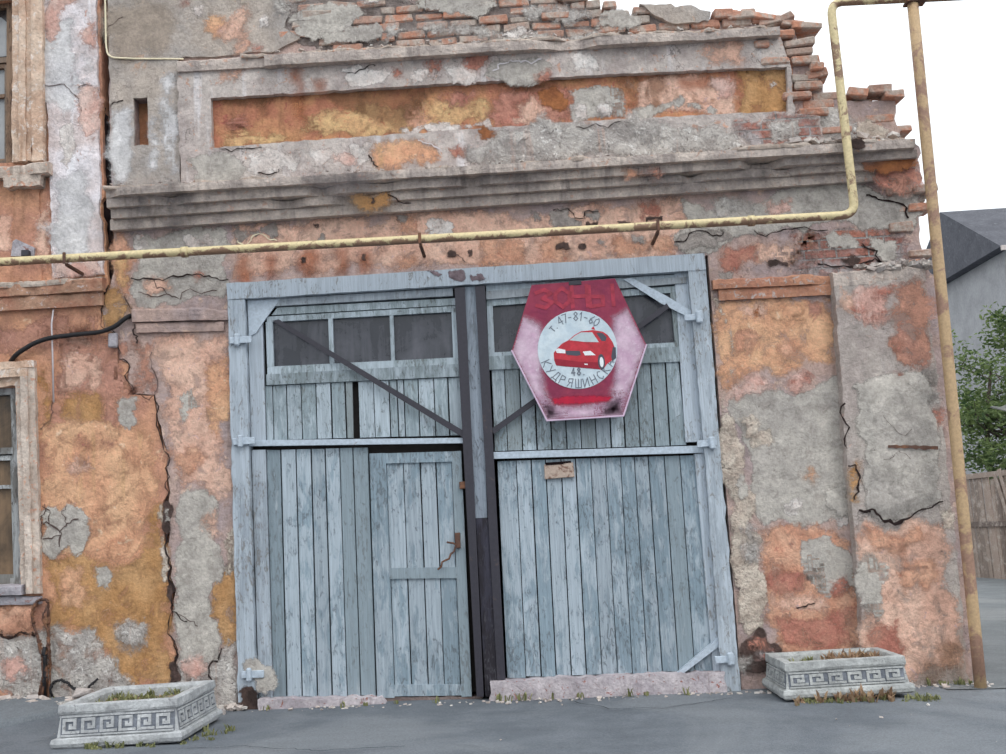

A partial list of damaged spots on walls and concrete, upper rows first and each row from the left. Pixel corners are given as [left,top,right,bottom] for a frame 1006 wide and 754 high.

crack [102,0,123,44]
peeling [185,0,767,73]
peeling [102,99,475,192]
spalling [339,56,552,125]
spalling [569,85,626,122]
spalling [728,107,905,151]
peeling [533,159,924,280]
peeling [428,239,525,282]
crack [40,84,187,683]
flaking render [719,369,829,673]
crack [864,501,943,526]
flaking render [0,605,135,697]